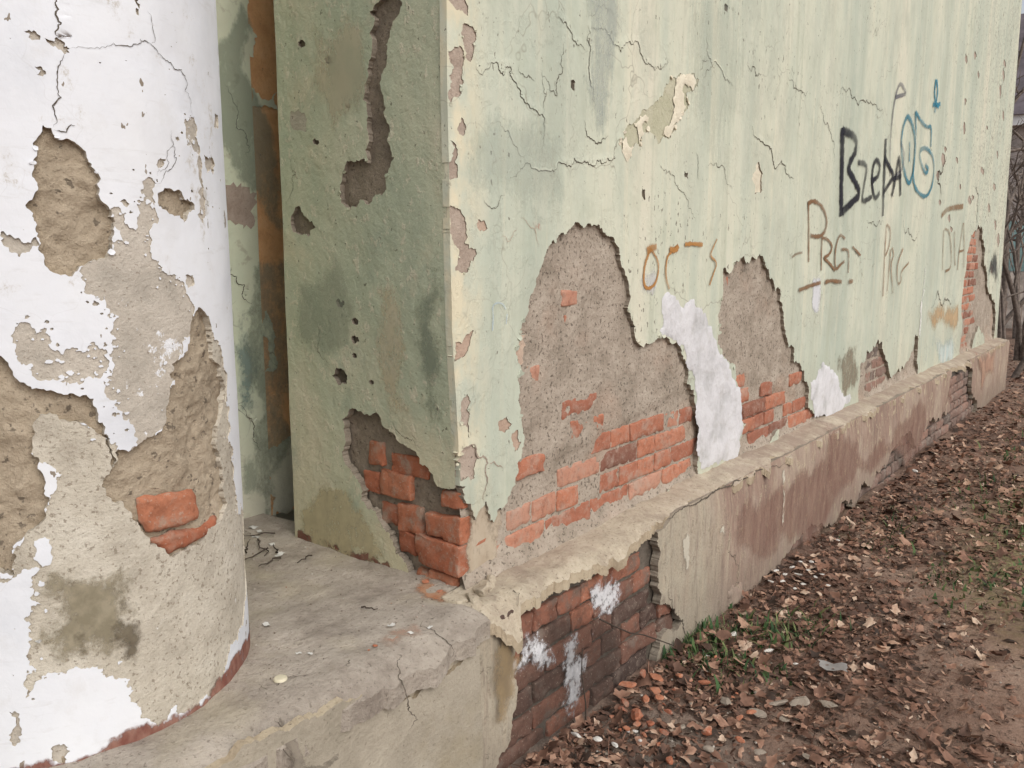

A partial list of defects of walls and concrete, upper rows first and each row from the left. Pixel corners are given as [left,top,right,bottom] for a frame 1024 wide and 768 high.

crack [52,0,190,133]
peeling [225,182,257,229]
flaking render [338,0,402,210]
crack [476,4,669,209]
peeling [0,114,245,725]
flaking render [348,223,698,590]
flaking render [717,256,824,456]
damp [40,573,139,658]
crack [397,656,418,728]
damp [515,632,587,710]
flaking render [496,539,675,768]
damp [590,582,620,614]